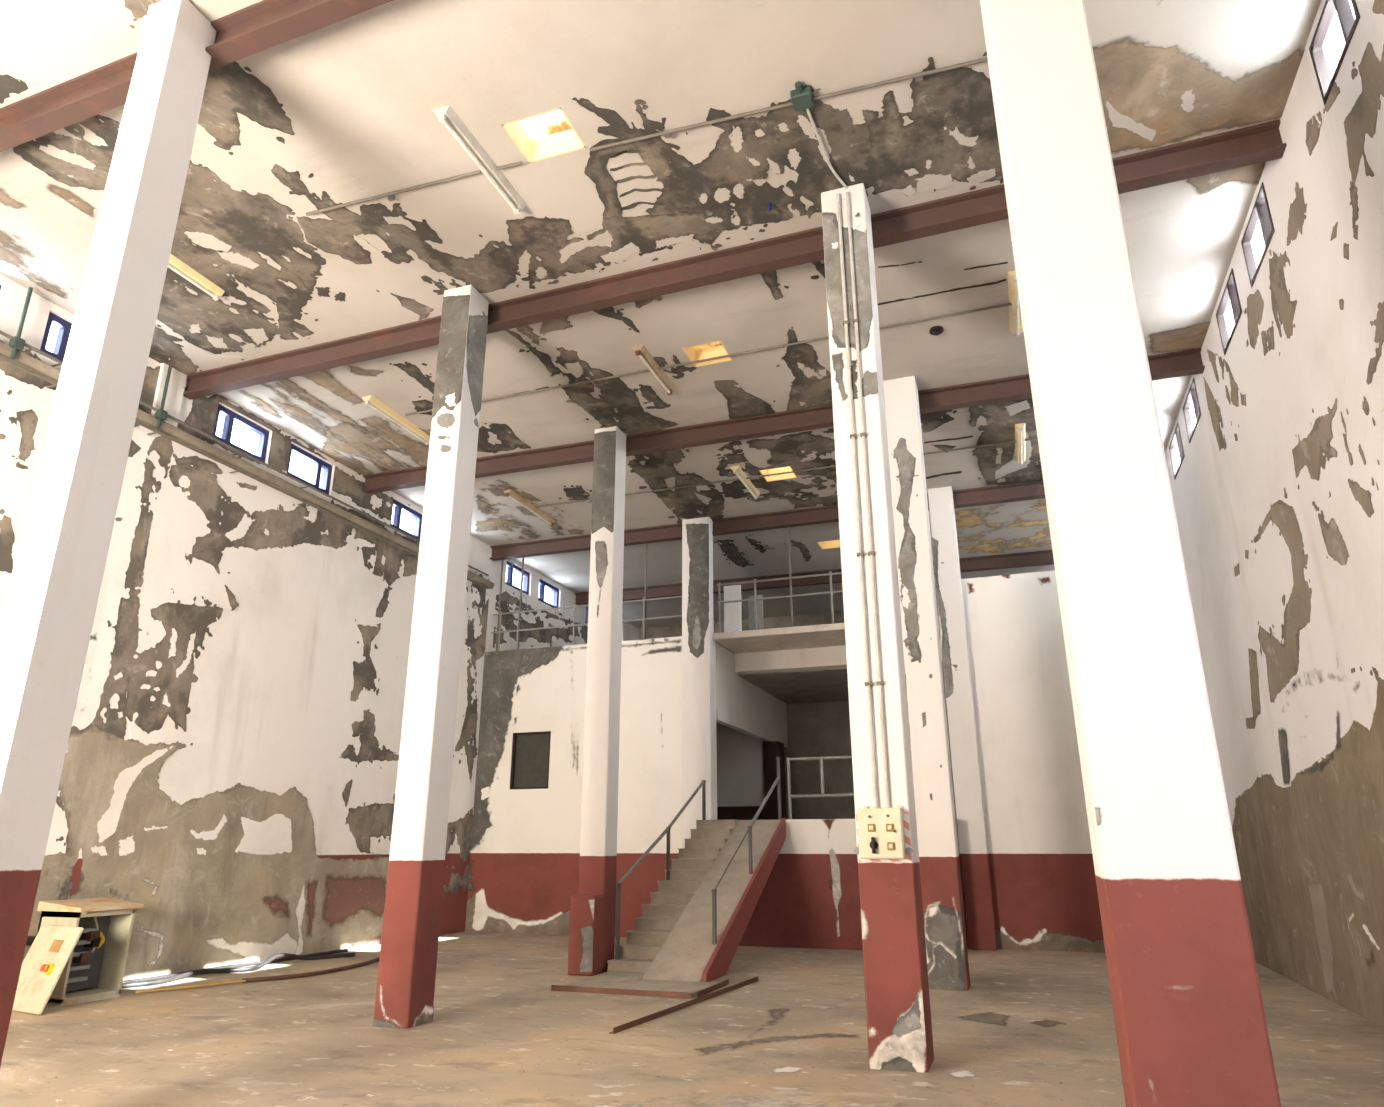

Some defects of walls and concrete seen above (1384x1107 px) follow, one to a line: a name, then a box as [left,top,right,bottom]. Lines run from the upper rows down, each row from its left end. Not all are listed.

peeling [0,74,29,104]
peeling [1306,42,1384,260]
peeling [1372,0,1384,15]
peeling [1244,182,1307,357]
peeling [0,509,15,573]
peeling [0,409,38,469]
peeling [0,340,57,395]
peeling [13,52,1004,981]
peeling [1203,349,1246,450]
peeling [1234,301,1384,729]
peeling [1232,667,1384,1028]
peeling [869,902,966,1073]